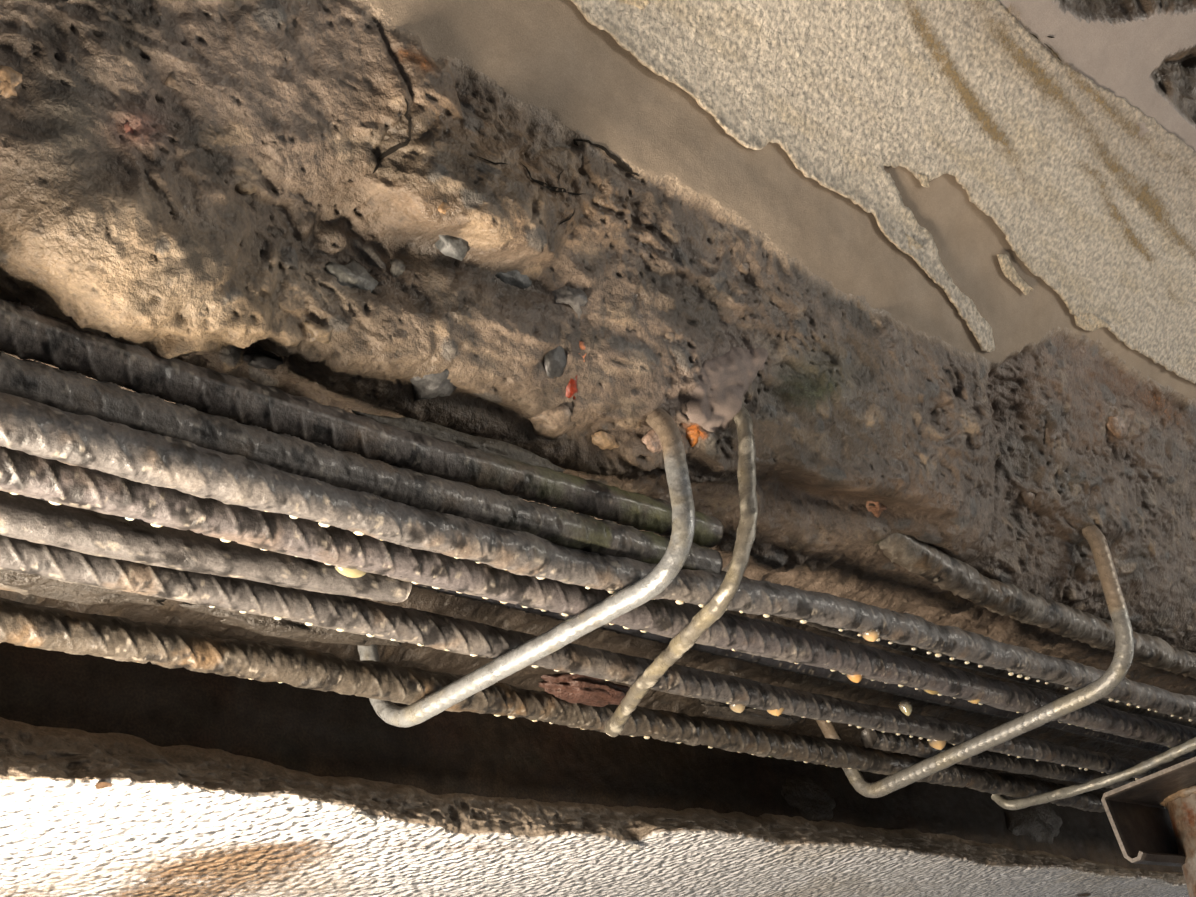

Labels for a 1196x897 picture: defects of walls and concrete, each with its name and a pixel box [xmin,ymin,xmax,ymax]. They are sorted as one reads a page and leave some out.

spalling [0,0,1196,705]
spalling [619,579,1106,776]
spalling [916,631,1196,799]
water stain [111,842,355,897]
flaking render [0,717,1196,897]